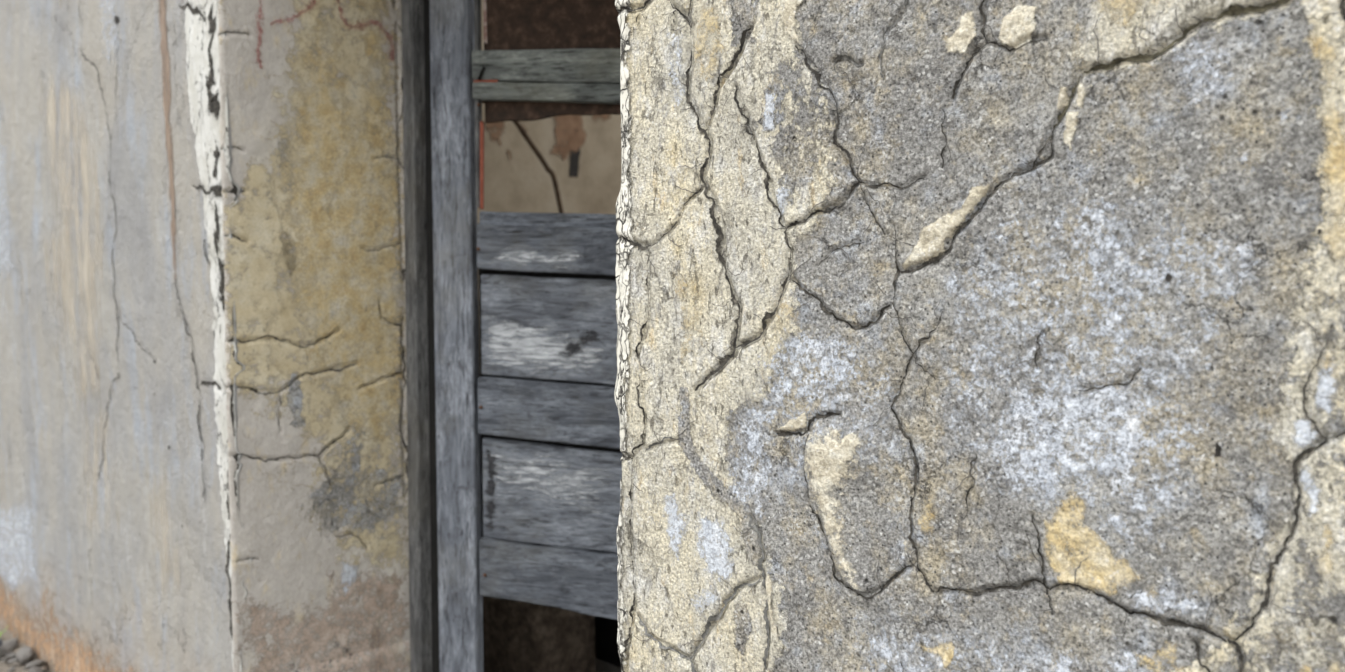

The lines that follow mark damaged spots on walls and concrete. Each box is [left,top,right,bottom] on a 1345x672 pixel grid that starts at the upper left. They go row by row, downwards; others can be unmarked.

crack [80,31,151,480]
peeling [184,0,306,672]
crack [175,2,408,652]
crack [619,0,1345,672]
flaking render [663,0,1345,672]